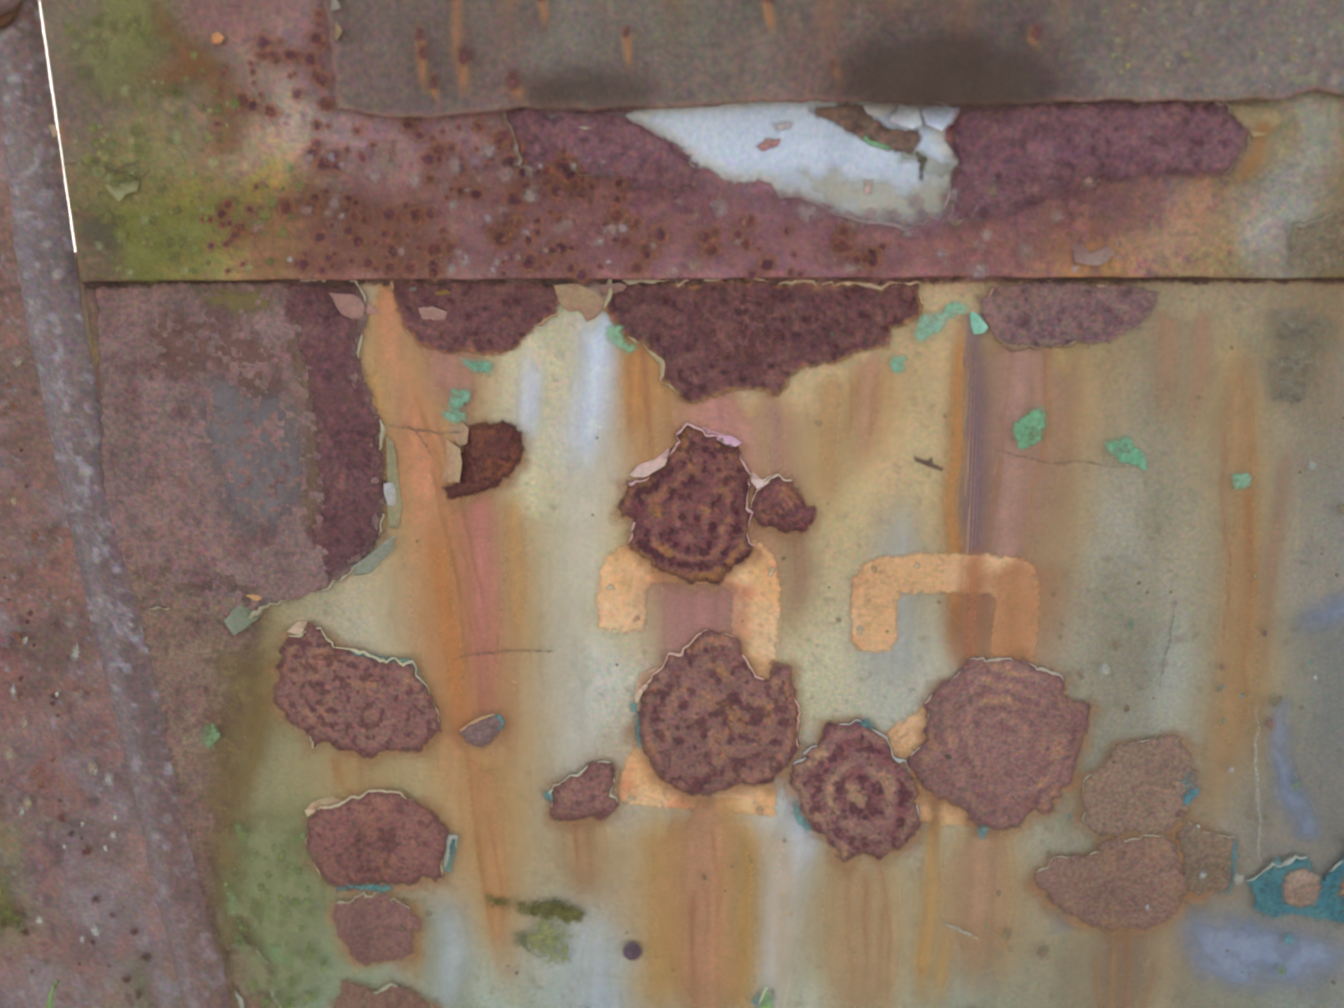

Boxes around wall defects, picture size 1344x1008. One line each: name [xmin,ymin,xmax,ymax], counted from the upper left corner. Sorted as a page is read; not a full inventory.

rust [504,70,699,196]
peeling [619,100,960,231]
rust [951,100,1270,227]
peeling [418,289,450,320]
peeling [554,283,626,321]
peeling [607,326,635,353]
rust [94,280,560,1008]
rust [603,278,1206,1008]
peeling [1225,840,1344,923]